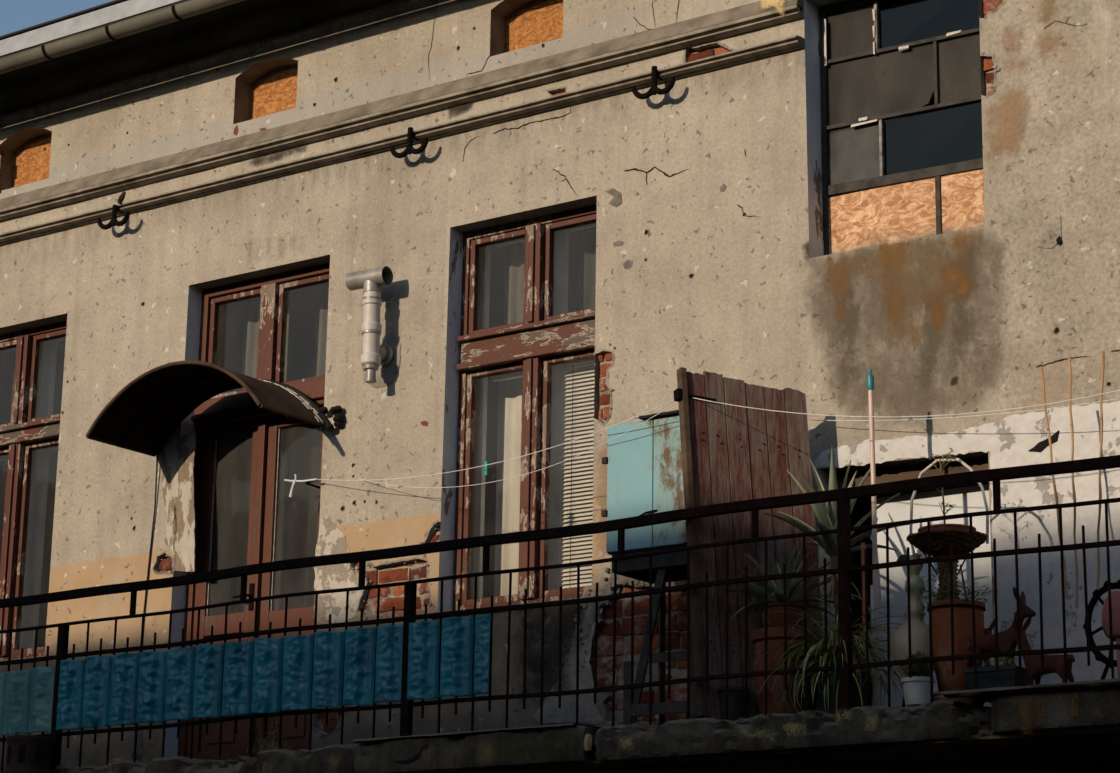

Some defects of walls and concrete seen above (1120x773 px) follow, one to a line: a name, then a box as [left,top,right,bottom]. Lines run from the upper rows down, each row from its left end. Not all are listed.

flaking render [982,0,1006,20]
crack [463,109,571,157]
crack [624,167,688,185]
flaking render [981,52,1001,98]
water stain [815,238,998,416]
peeling [152,433,196,575]
flaking render [314,500,441,623]
flaking render [574,562,687,726]